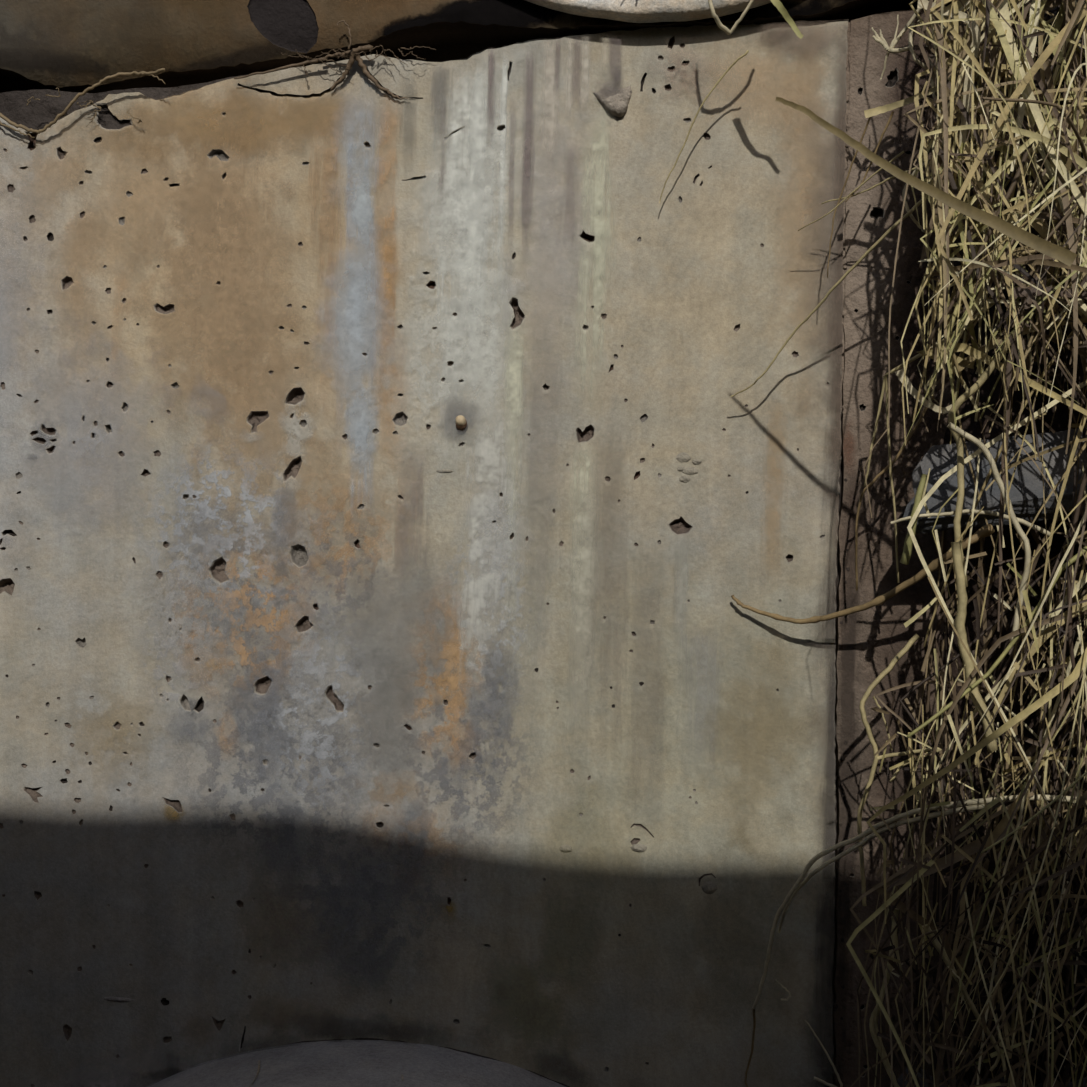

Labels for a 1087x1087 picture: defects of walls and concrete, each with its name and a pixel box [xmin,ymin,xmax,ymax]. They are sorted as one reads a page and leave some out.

spalling [95,103,133,130]
leakage [441,52,507,380]
leakage [594,179,608,310]
leakage [508,350,522,417]
leakage [162,463,285,640]
corrosion [191,566,290,677]
leakage [451,426,522,691]
leakage [228,630,362,823]
corrosion [419,629,471,750]